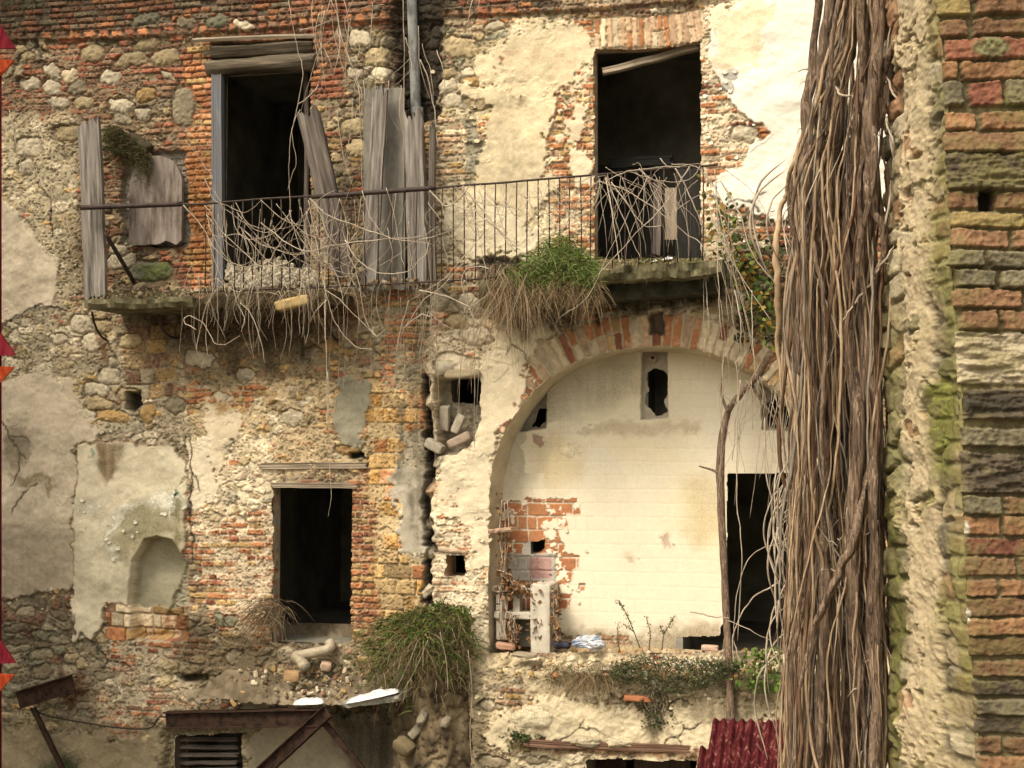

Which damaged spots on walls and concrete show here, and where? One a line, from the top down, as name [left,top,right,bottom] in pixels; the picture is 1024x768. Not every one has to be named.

spalling [431,60,483,185]
spalling [547,86,596,242]
spalling [699,69,773,163]
crack [2,422,38,511]
damp [91,443,121,480]
peeling [76,490,187,561]
crack [425,374,438,604]
peeling [508,496,588,609]
spalling [104,601,190,643]